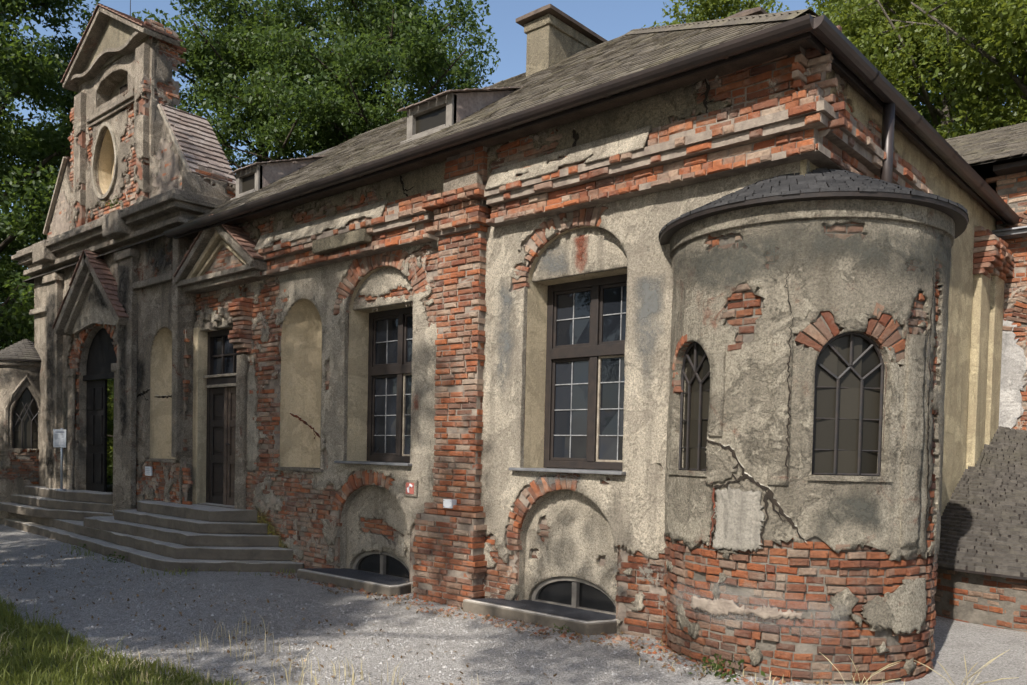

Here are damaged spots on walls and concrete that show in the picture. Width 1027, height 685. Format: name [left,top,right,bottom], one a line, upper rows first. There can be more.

spalling [47,107,95,239]
spalling [85,18,186,224]
spalling [195,166,236,200]
spalling [241,187,390,243]
spalling [510,205,608,292]
spalling [670,46,853,138]
spalling [999,228,1027,358]
spalling [136,329,193,508]
spalling [194,276,395,569]
crack [704,273,807,549]
spalling [614,256,943,685]
spalling [1013,372,1027,431]